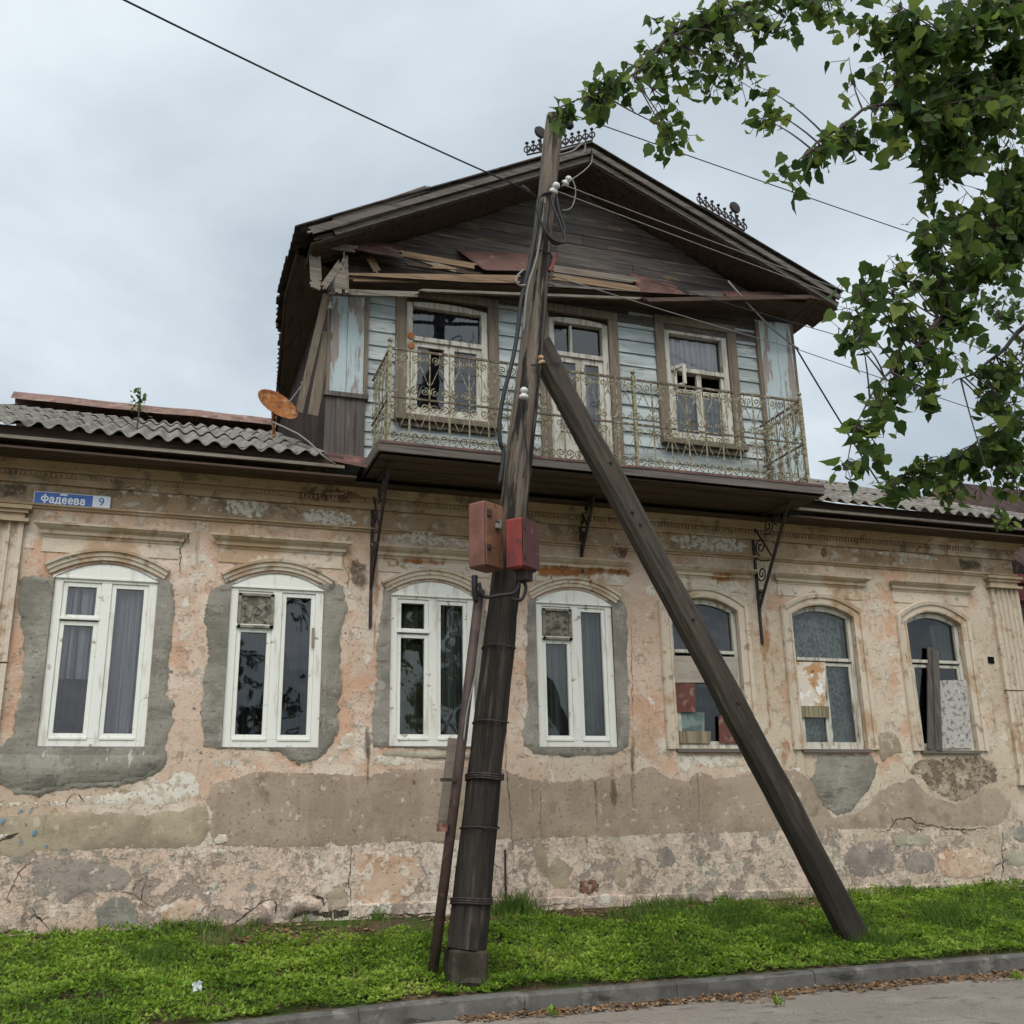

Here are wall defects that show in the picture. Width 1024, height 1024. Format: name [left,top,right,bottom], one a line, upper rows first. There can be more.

peeling [303,488,361,529]
peeling [670,533,749,552]
spalling [911,756,1004,801]
crack [0,863,50,935]
spalling [11,850,138,928]
peeling [159,888,214,926]
spalling [533,840,606,901]
spalling [657,846,677,874]
crack [879,817,1021,887]